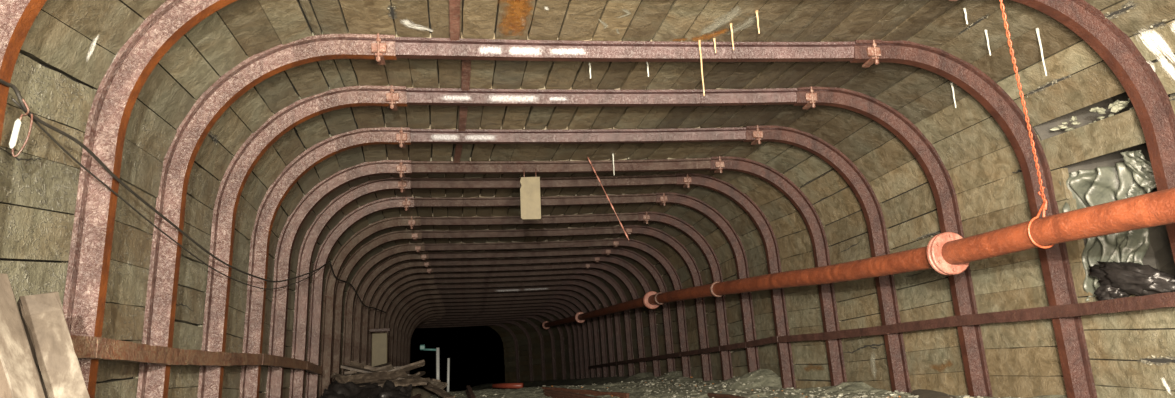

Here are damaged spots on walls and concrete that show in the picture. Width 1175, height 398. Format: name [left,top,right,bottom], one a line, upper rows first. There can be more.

corrosion [500,0,532,35]
damp [1138,22,1175,80]